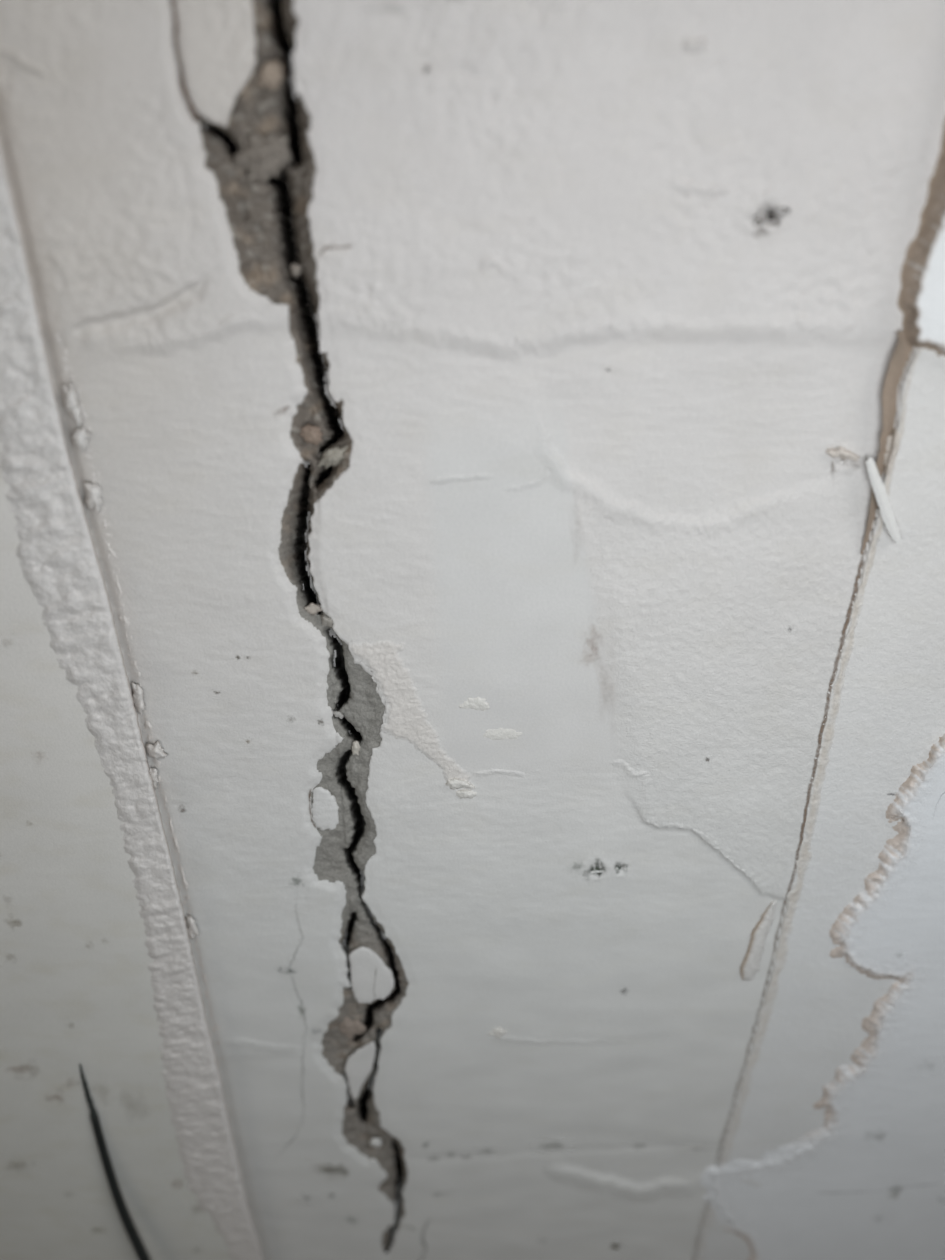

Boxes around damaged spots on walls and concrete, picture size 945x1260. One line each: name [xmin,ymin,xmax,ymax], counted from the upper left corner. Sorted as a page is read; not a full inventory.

crack [171,0,427,1253]
spalling [348,640,472,791]
crack [718,331,923,1167]